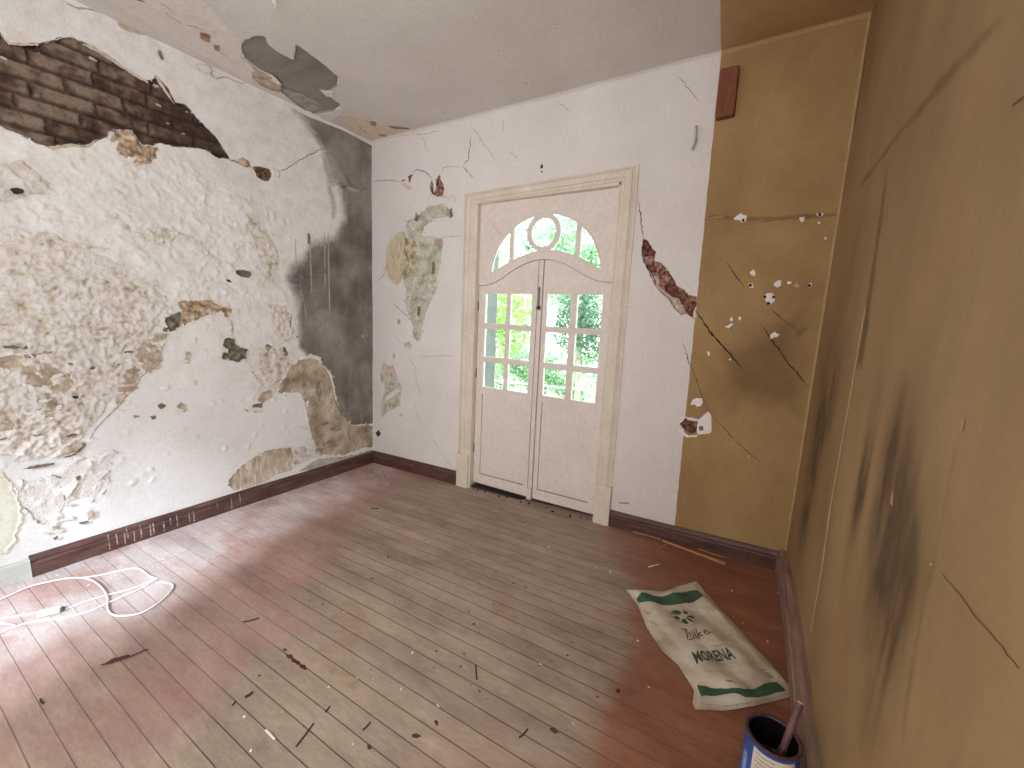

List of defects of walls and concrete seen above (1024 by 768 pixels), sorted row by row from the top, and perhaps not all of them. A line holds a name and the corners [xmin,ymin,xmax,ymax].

spalling [0,33,281,182]
peeling [108,0,345,122]
crack [279,120,516,200]
peeling [103,299,381,490]
leakage [291,117,373,425]
peeling [380,174,454,417]
crack [638,200,652,279]
spalling [642,239,698,319]
crack [694,309,745,371]
crack [763,310,806,385]
peeling [0,442,117,554]
crack [943,575,1019,668]